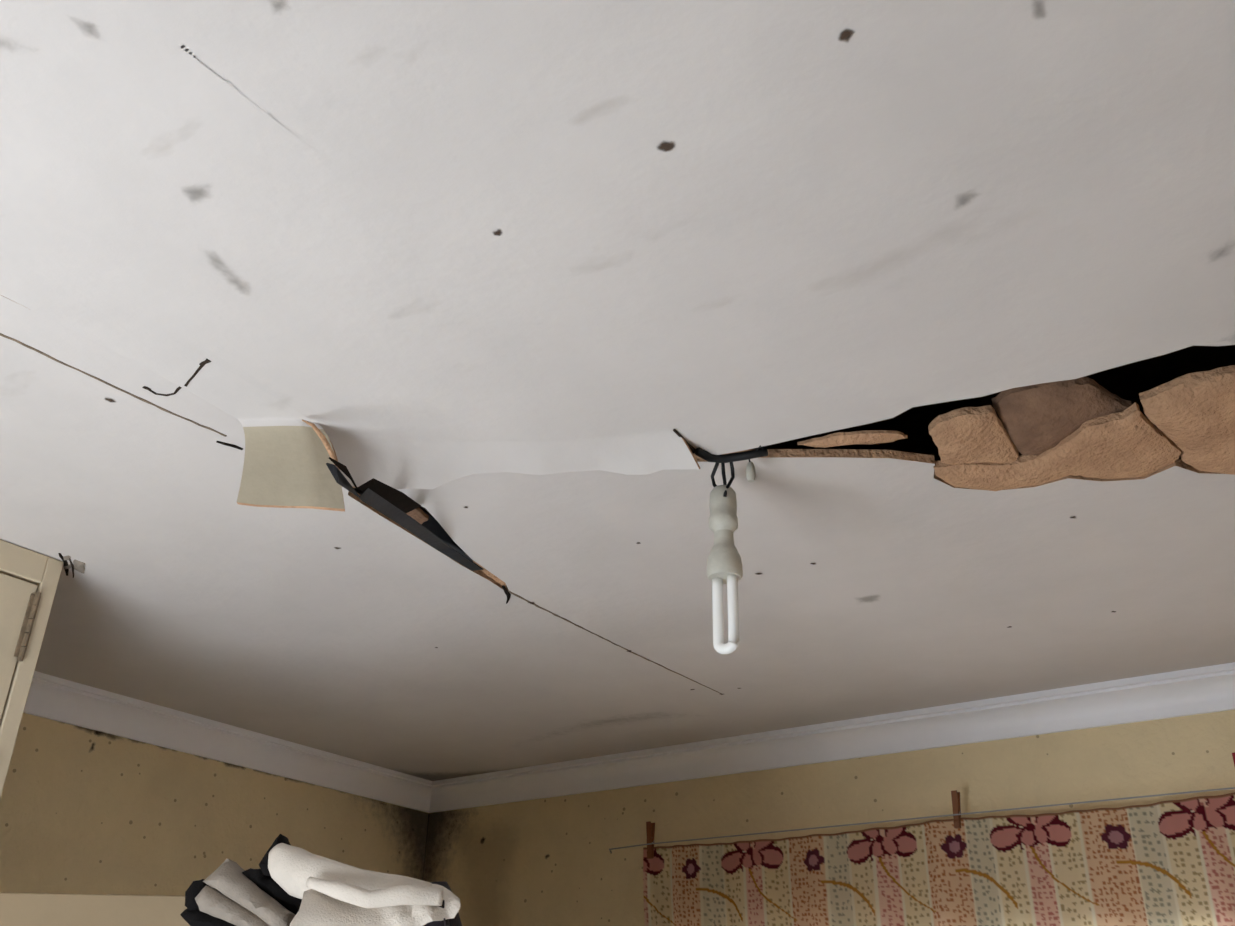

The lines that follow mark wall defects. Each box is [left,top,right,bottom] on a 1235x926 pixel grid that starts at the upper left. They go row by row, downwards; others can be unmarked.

crack [0,333,243,450]
crack [502,586,722,694]